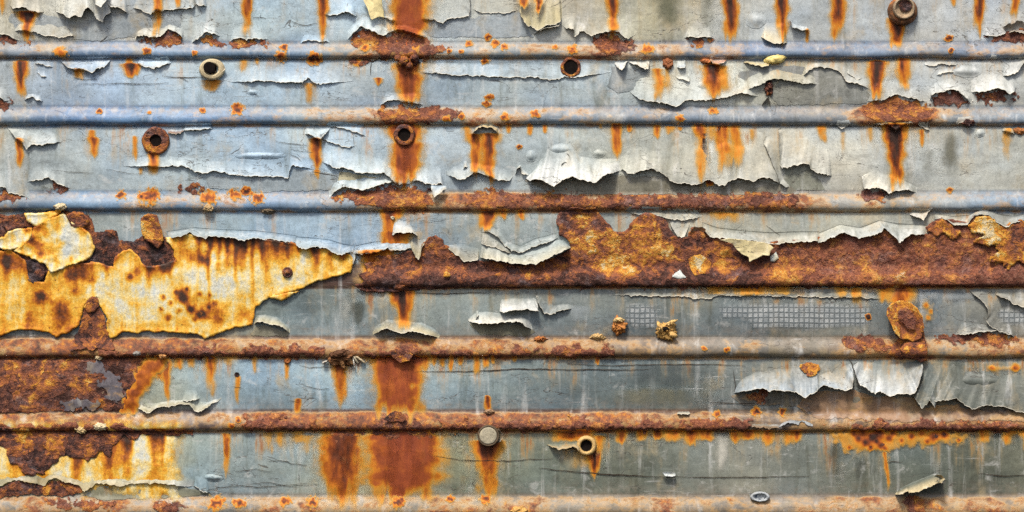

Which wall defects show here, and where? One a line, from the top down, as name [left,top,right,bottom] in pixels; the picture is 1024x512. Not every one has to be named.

peeling [0,0,268,42]
peeling [421,20,1024,107]
peeling [123,122,832,198]
corrosion [331,0,1024,363]
corrosion [0,248,48,282]
corrosion [80,215,175,266]
peeling [448,226,571,265]
peeling [468,294,574,329]
corrosion [0,342,348,512]
corrosion [223,342,802,510]
peeling [735,361,1024,429]
corrosion [827,417,1024,487]